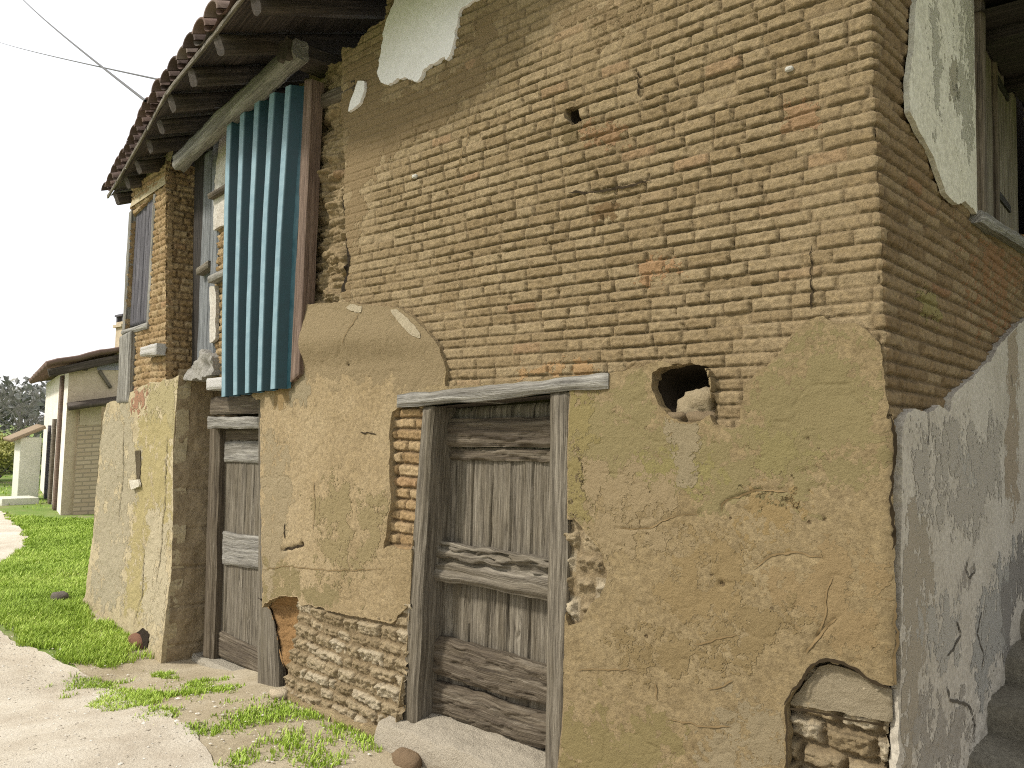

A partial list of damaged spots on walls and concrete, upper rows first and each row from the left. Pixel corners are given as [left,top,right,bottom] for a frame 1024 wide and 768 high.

peeling [554,0,649,55]
peeling [339,0,499,258]
spalling [391,309,421,338]
crack [807,245,815,309]
flaking render [388,406,429,550]
leakage [568,417,706,586]
crack [616,489,788,530]
flaking render [563,519,607,624]
flaking render [268,596,412,725]
crack [948,607,984,667]
spalling [790,661,893,768]
crack [947,685,976,747]